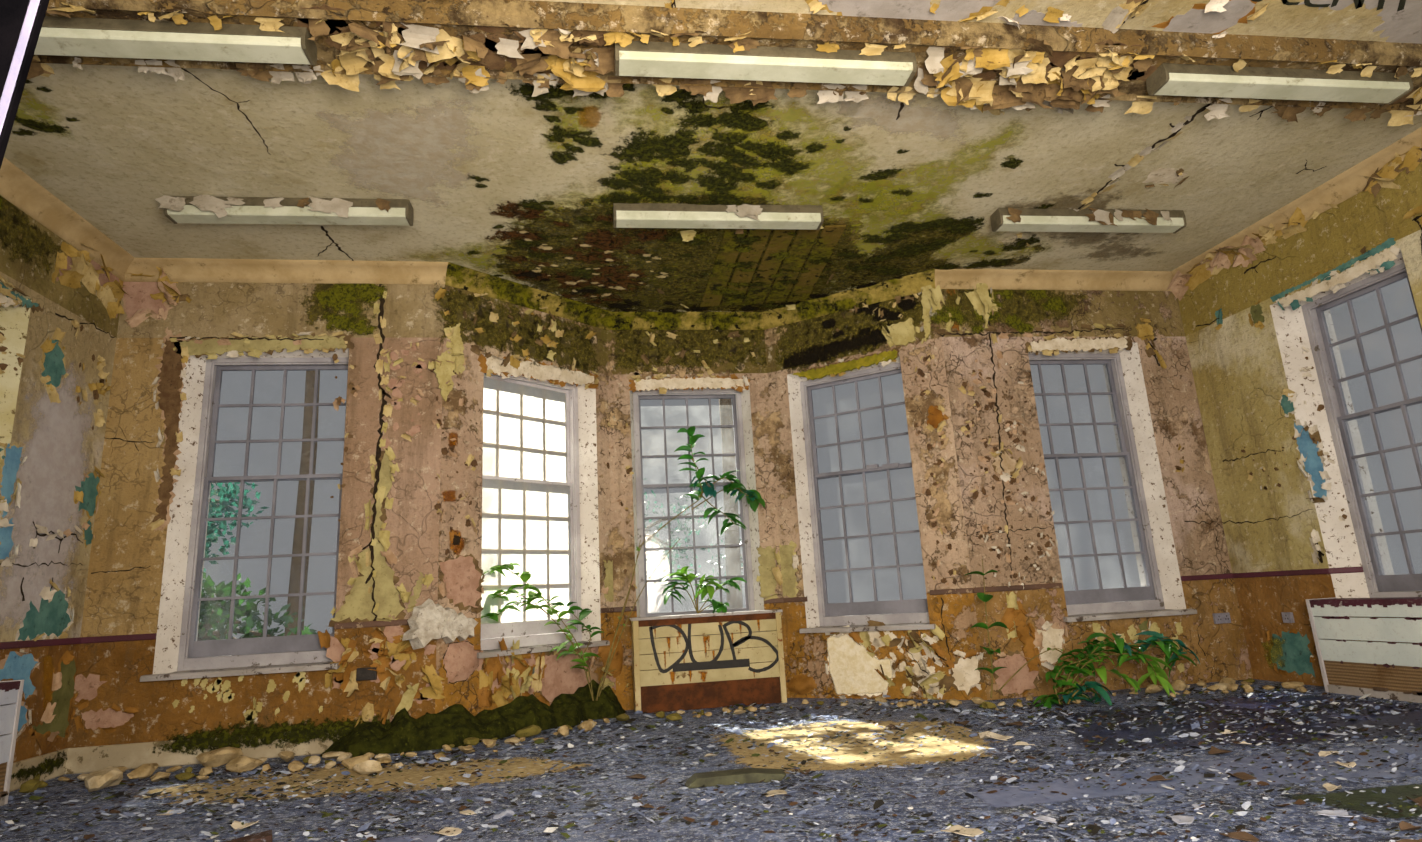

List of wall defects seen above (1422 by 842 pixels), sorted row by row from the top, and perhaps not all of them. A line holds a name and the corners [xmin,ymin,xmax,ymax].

crack [664,0,676,9]
crack [181,68,271,155]
damp [417,83,1085,380]
crack [1069,104,1210,211]
peeling [1248,238,1400,330]
crack [317,226,393,621]
peeling [172,288,599,728]
peeling [804,283,1068,700]
peeling [1241,337,1347,523]
peeling [0,579,139,742]
damp [152,714,395,755]
peeling [474,638,629,707]